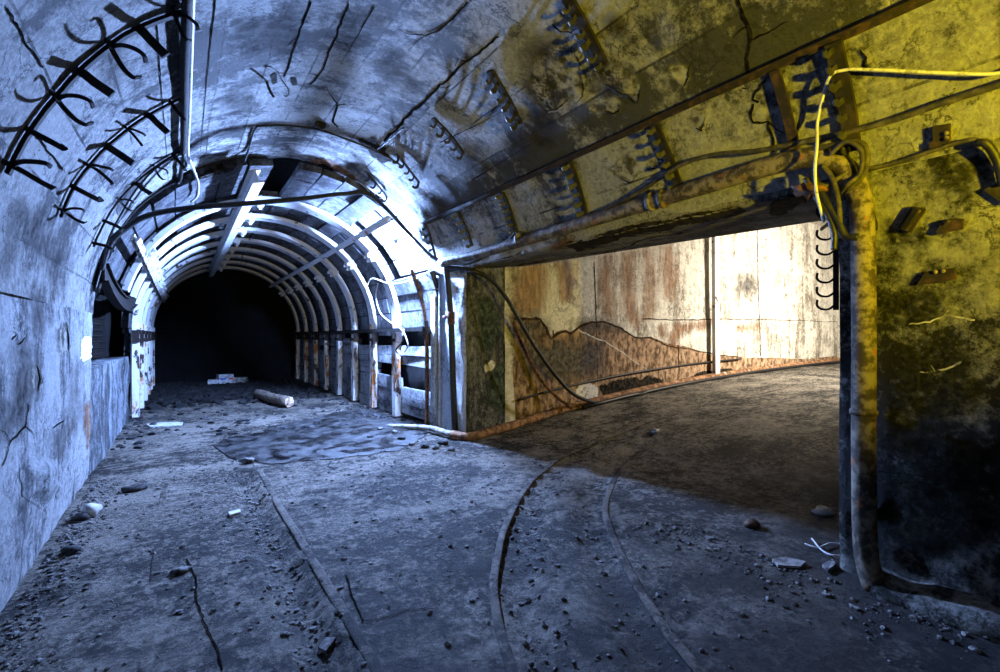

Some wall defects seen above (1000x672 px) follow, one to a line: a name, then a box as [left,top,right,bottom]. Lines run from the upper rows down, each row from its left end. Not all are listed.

crack [283,1,375,127]
crack [733,0,788,152]
rust [622,248,674,326]
leakage [878,289,950,327]
spalling [576,375,663,399]
crack [0,404,64,466]
leakage [877,338,991,560]